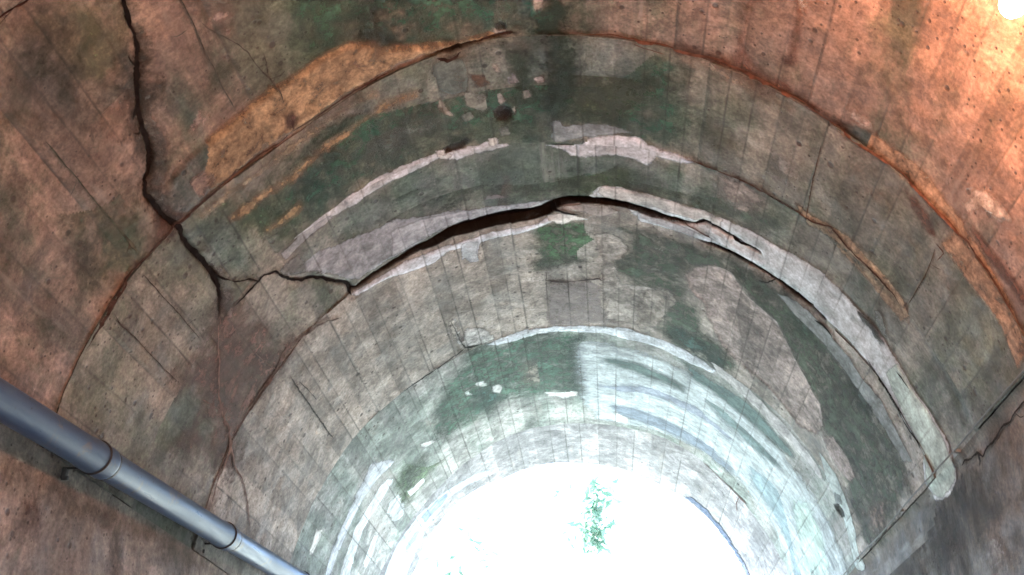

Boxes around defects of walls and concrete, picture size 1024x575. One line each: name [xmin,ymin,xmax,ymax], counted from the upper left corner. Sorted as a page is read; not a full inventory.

leakage [508,51,532,106]
corrosion [190,32,495,220]
spalling [436,138,470,157]
corrosion [266,203,301,231]
peeling [391,200,548,255]
crack [455,195,610,225]
peeling [722,173,762,211]
corrosion [677,37,1024,367]
crack [46,0,422,526]
peeling [595,233,676,329]
crack [400,322,479,395]
crack [962,401,1024,466]